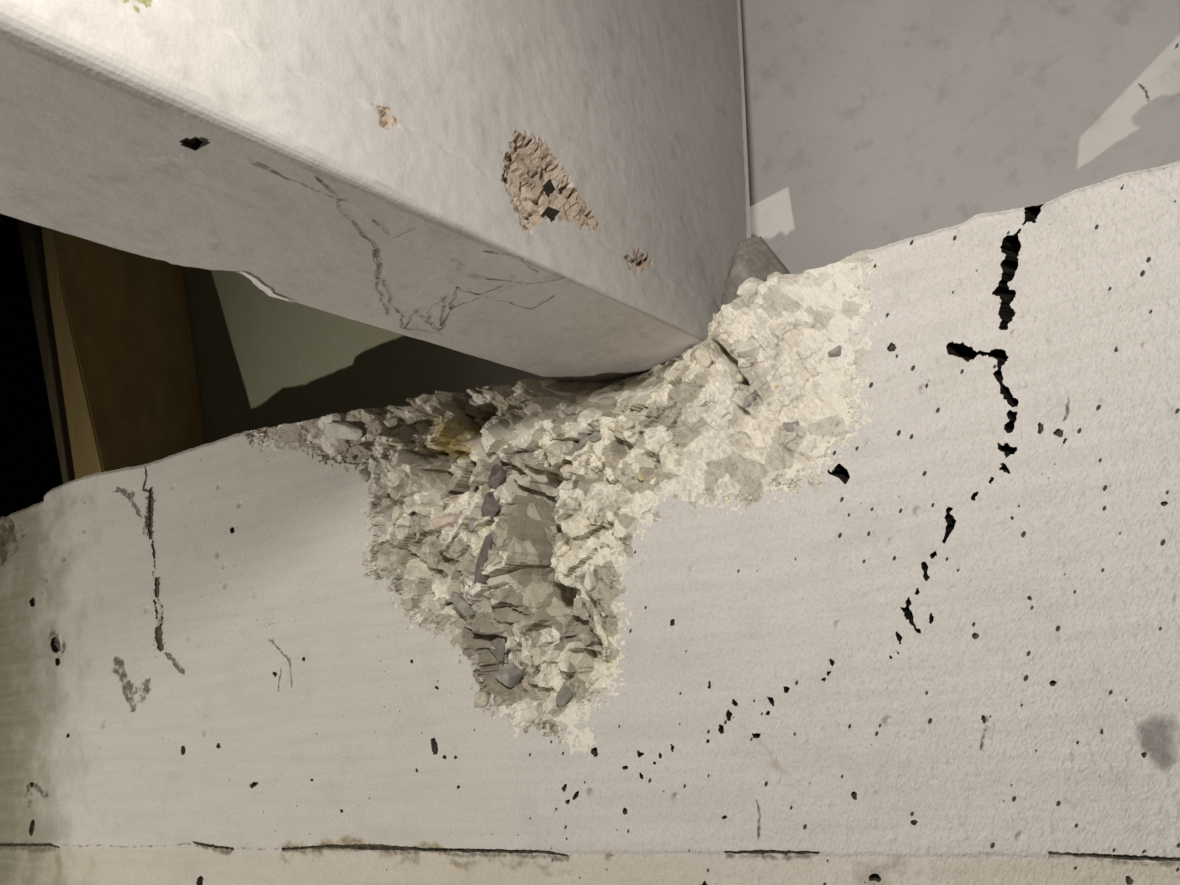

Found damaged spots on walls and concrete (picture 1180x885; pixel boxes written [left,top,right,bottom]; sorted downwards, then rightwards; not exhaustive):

crack [252,163,566,335]
spalling [500,129,601,233]
crack [112,466,184,674]
spalling [239,249,888,759]
crack [889,204,1044,659]
crack [637,744,674,779]
crack [706,686,790,743]
crack [822,659,834,682]